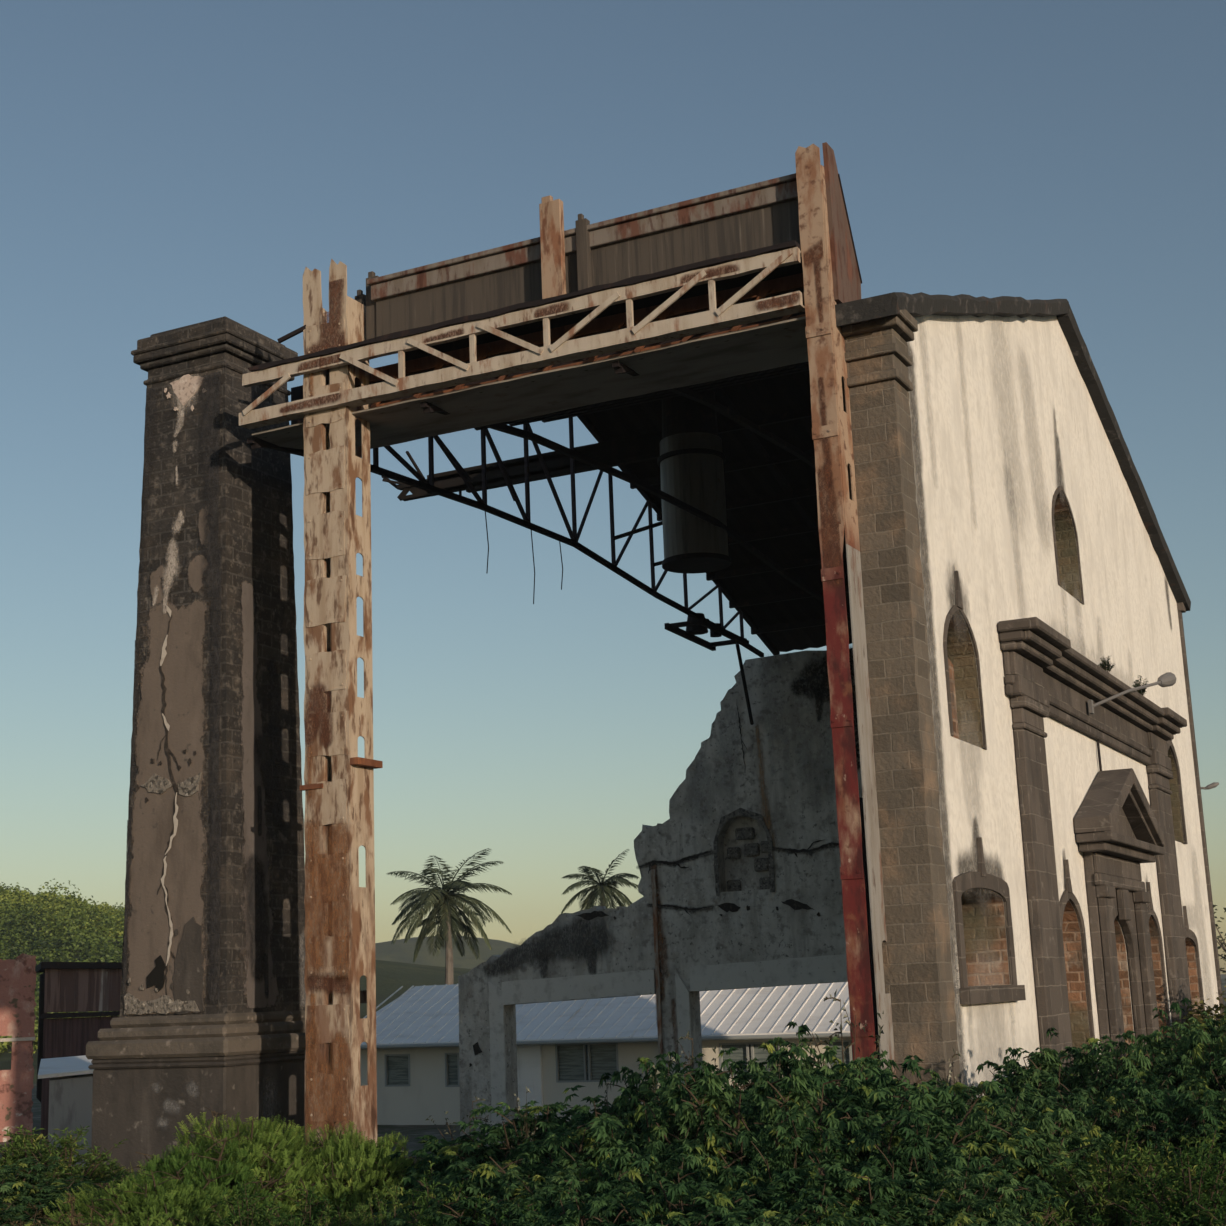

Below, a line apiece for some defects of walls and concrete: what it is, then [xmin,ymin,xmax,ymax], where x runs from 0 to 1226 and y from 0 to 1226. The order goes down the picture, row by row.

rust [305,279,345,355]
rust [424,329,464,343]
rust [681,265,738,284]
rust [804,240,824,322]
spalling [164,374,207,411]
rust [280,373,340,413]
rust [818,377,843,585]
water stain [1054,410,1065,503]
peeling [124,506,212,1015]
crack [157,605,179,995]
rust [305,684,332,797]
rust [305,822,351,1130]